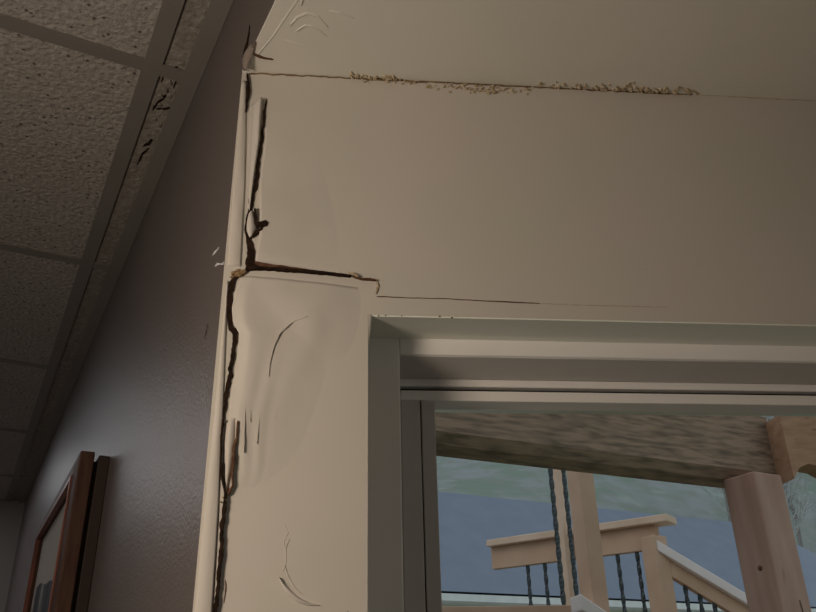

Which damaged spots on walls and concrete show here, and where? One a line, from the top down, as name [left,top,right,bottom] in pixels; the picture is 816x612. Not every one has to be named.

crack [213,25,816,612]